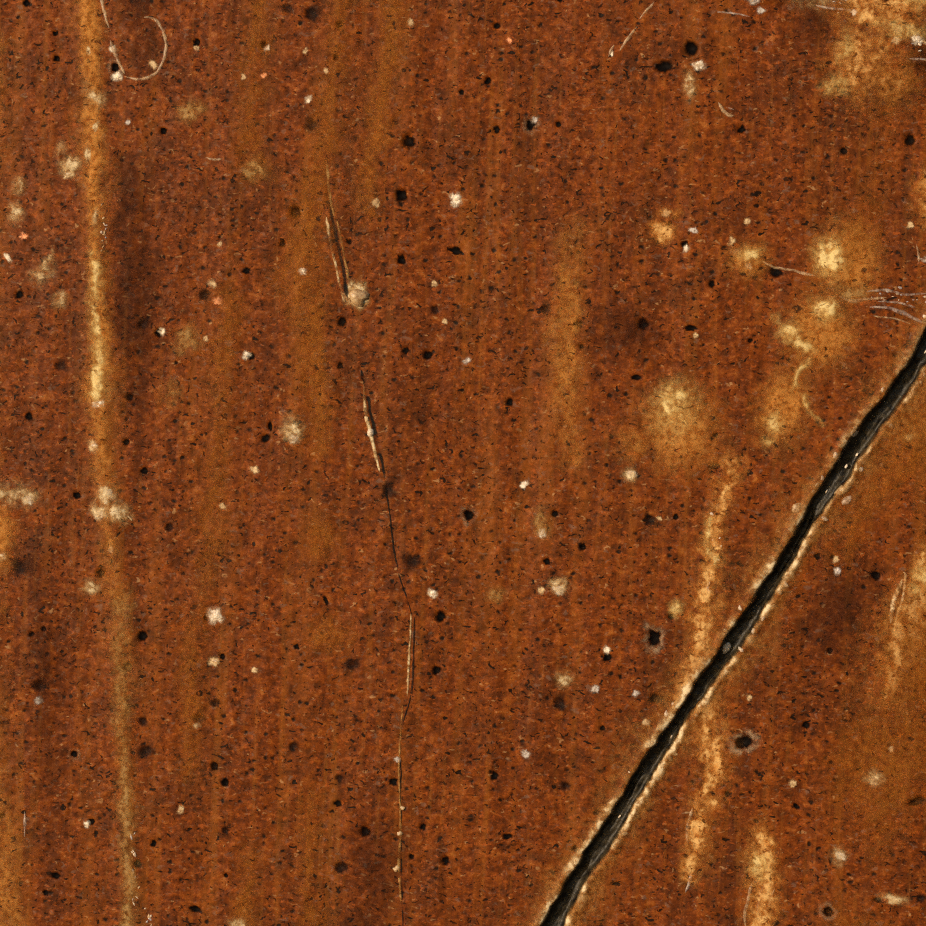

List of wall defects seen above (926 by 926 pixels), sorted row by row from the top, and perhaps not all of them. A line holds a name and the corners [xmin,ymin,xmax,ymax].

damp [832,0,926,86]
damp [62,0,110,469]
crack [326,165,348,299]
damp [653,223,672,242]
damp [737,249,758,270]
damp [783,229,926,360]
damp [658,389,704,456]
damp [760,364,808,435]
damp [92,486,132,521]
crack [361,370,415,926]
crack [539,315,926,926]
damp [120,759,152,926]